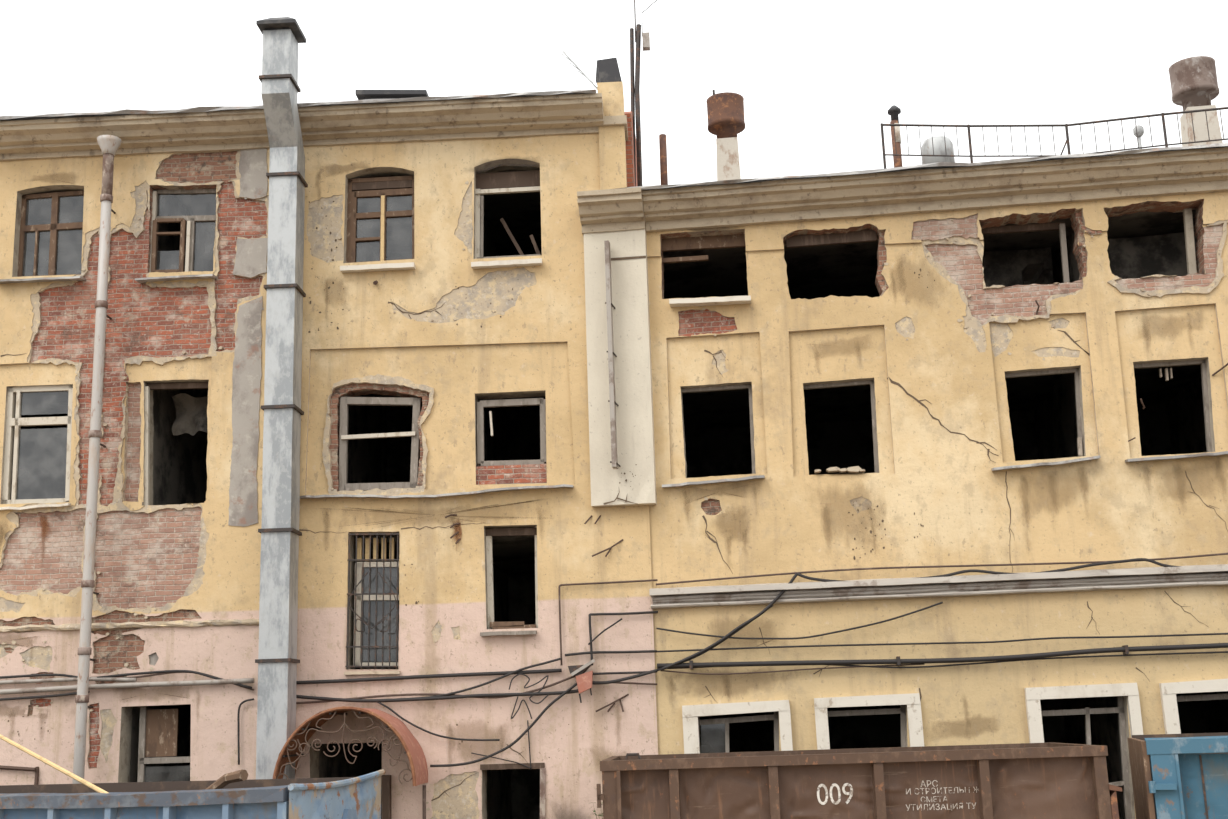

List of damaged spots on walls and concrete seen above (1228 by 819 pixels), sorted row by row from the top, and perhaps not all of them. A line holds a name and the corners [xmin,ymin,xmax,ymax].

flaking render [391,267,537,328]
flaking render [911,210,1102,357]
flaking render [1108,220,1228,297]
flaking render [678,308,737,375]
flaking render [1031,347,1080,361]
flaking render [0,150,269,735]
crack [887,378,1015,572]
flaking render [87,703,117,769]